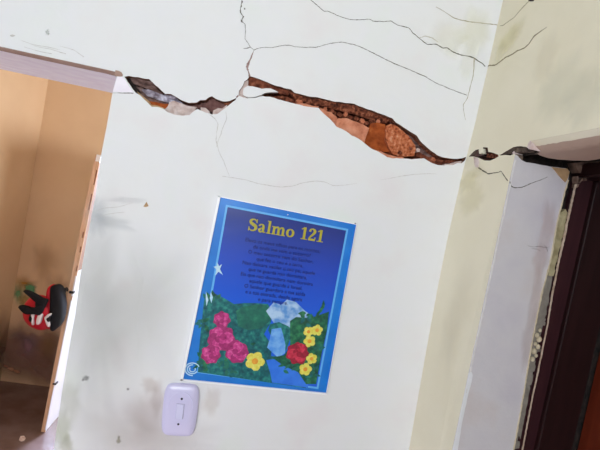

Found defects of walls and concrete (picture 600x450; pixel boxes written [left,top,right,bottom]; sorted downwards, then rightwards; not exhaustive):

crack [124,0,600,188]